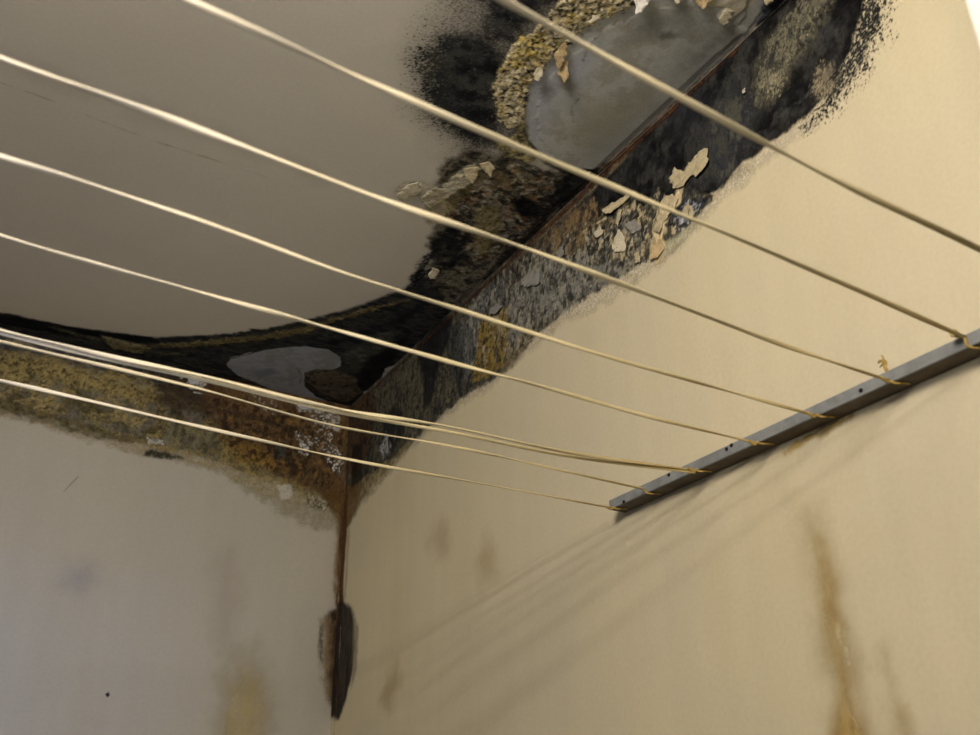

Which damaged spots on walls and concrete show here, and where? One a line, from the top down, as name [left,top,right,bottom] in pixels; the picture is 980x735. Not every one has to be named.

peeling [227,346,341,402]
damp [0,0,898,529]
corrosion [367,48,738,395]
peeling [345,0,815,524]
corrosion [318,483,363,724]